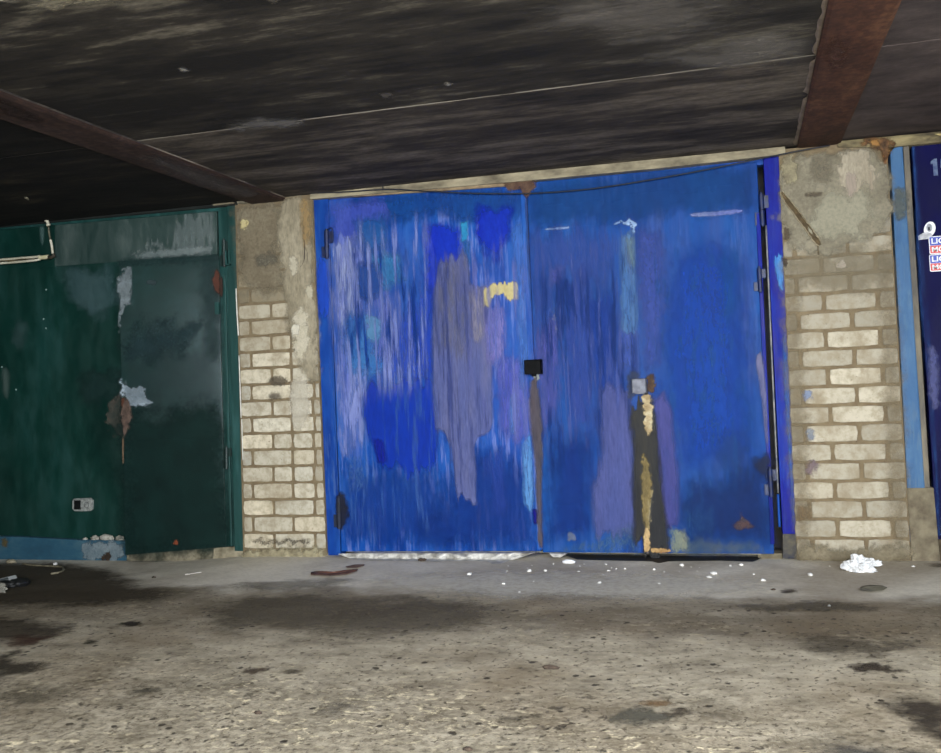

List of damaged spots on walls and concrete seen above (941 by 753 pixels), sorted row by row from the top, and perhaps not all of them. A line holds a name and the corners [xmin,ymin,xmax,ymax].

leakage [29,0,99,9]
flaking render [781,154,797,184]
peeling [117,266,132,323]
spalling [291,285,313,360]
peeling [119,381,153,406]
corrosion [106,391,132,462]
corrosion [528,374,543,547]